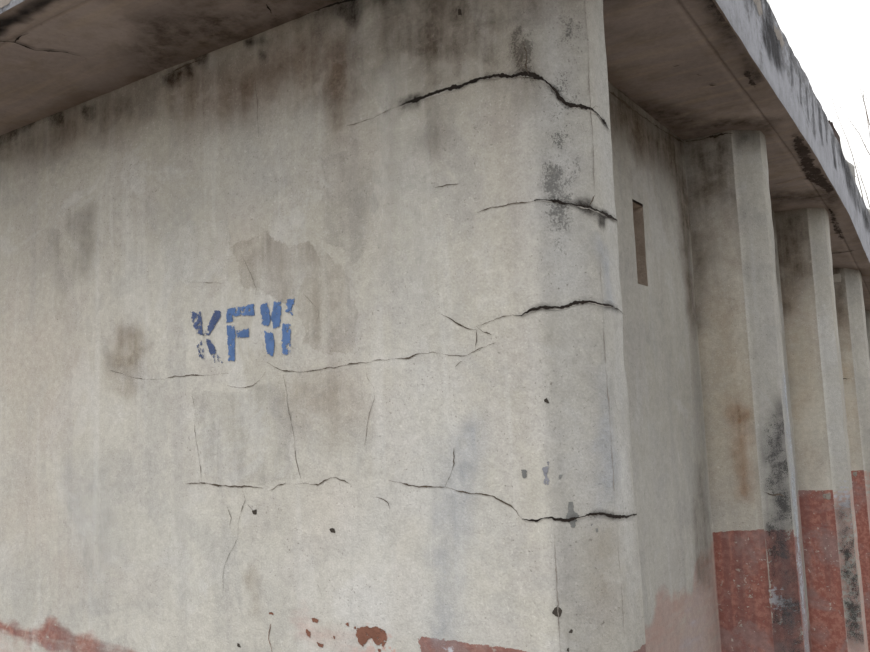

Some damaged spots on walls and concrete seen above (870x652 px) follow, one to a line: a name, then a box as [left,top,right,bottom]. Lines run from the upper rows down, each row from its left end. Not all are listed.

damp [0,0,53,34]
damp [763,0,781,69]
crack [351,15,732,222]
damp [813,107,869,229]
crack [110,264,637,651]
peeling [346,623,387,652]
damp [765,423,805,652]
mould [840,530,864,641]